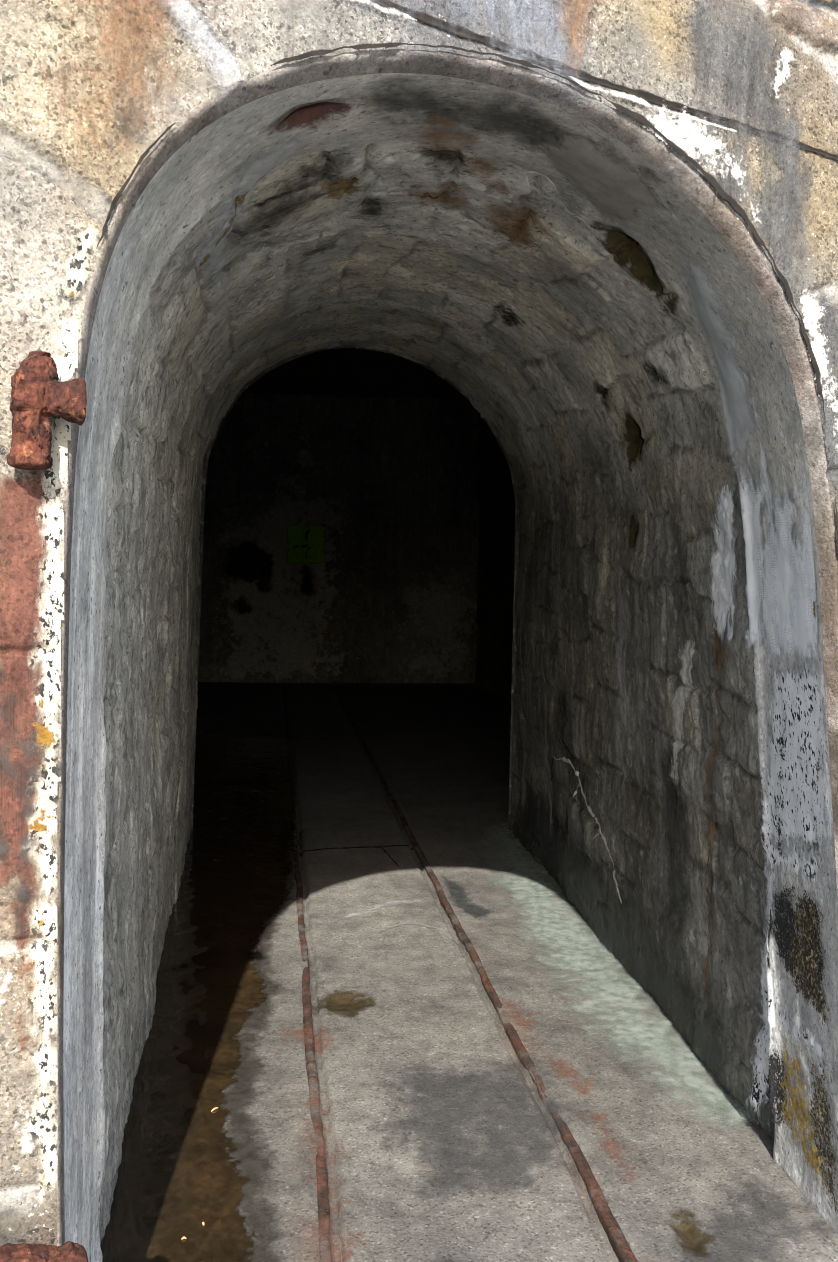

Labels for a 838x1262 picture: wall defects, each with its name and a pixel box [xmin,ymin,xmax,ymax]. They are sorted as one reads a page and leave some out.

water stain [360,0,415,20]
crack [96,123,175,249]
crack [268,0,838,425]
spalling [590,221,676,314]
water stain [571,0,810,276]
water stain [800,287,838,483]
rust [0,474,56,969]